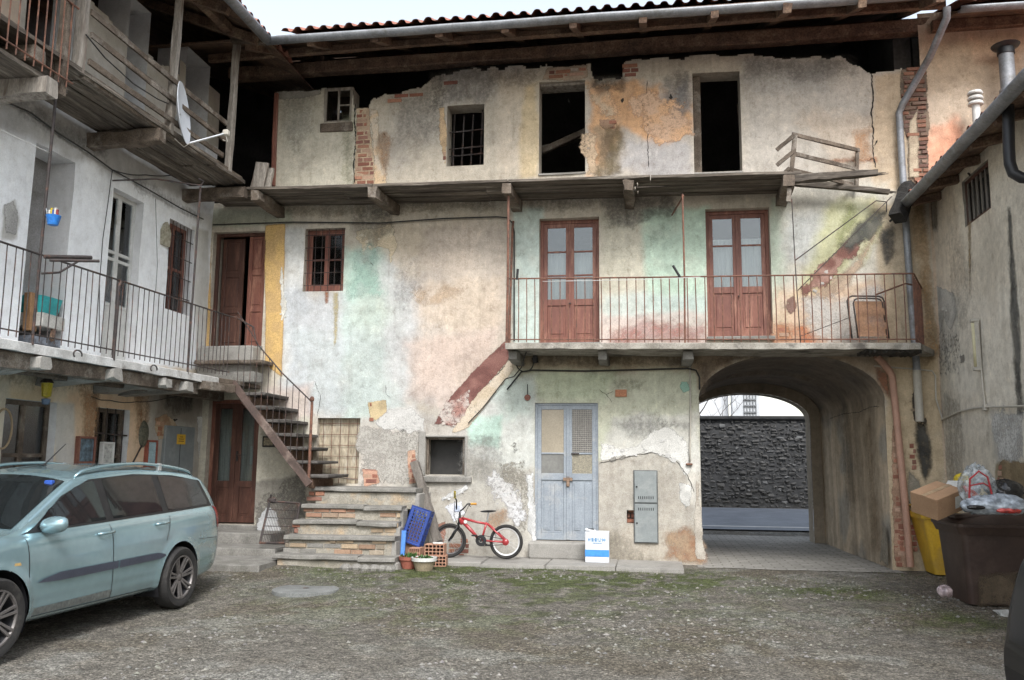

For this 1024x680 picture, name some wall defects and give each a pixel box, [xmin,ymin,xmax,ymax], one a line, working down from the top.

flaking render [354,108,387,184]
peeling [543,63,695,176]
crack [868,74,878,167]
flaking render [901,67,928,181]
damp [1008,209,1023,414]
peeling [356,342,513,486]
peeling [486,470,537,541]
peeling [600,426,706,560]
flaking render [891,426,918,567]
damp [915,422,931,479]